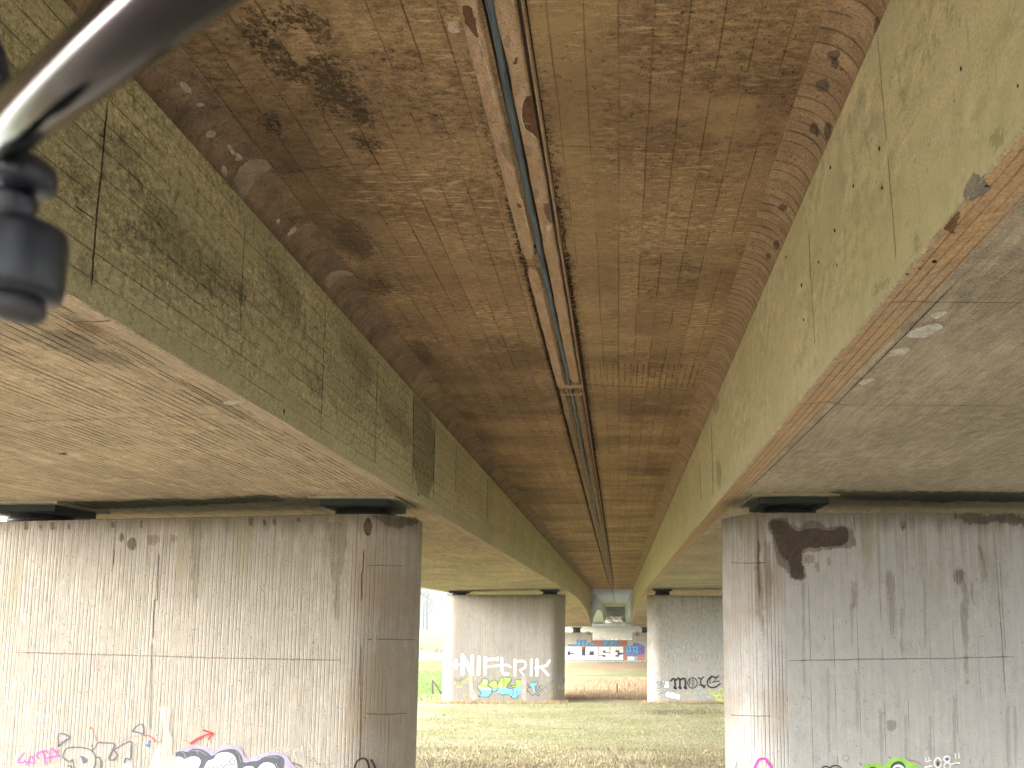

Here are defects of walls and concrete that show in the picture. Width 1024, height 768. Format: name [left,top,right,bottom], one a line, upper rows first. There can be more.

damp [240,4,382,153]
peeling [462,5,496,107]
damp [815,50,840,92]
peeling [520,96,538,142]
damp [810,122,831,140]
peeling [221,144,243,177]